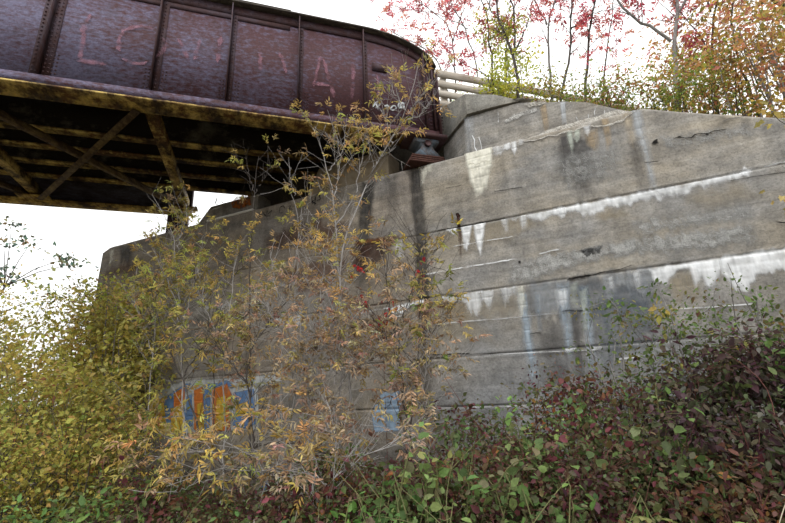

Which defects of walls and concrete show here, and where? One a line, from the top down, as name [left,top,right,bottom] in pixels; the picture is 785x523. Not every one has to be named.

crack [676,116,744,138]
damp [465,136,516,193]
damp [497,162,785,227]
damp [387,167,435,330]
damp [650,248,785,297]
damp [558,282,599,368]